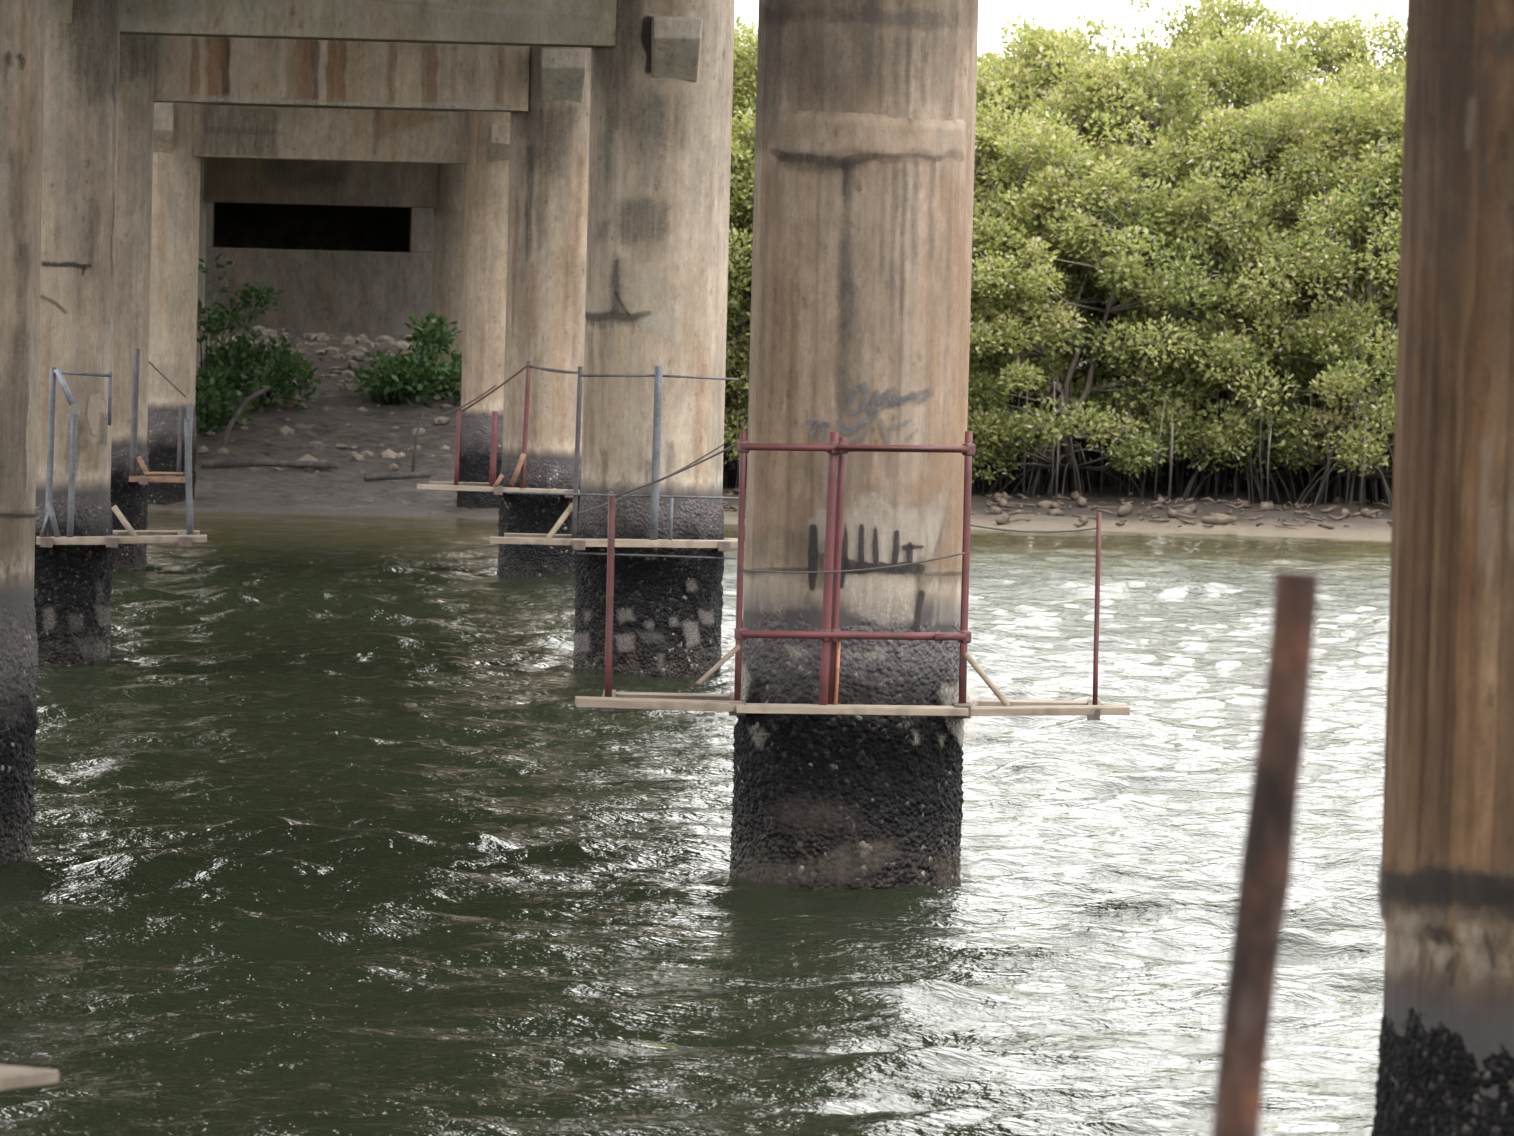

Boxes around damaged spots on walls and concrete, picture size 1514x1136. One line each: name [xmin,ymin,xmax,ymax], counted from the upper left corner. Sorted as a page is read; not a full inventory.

corrosion [207,37,230,102]
corrosion [302,40,346,106]
crack [0,511,39,519]